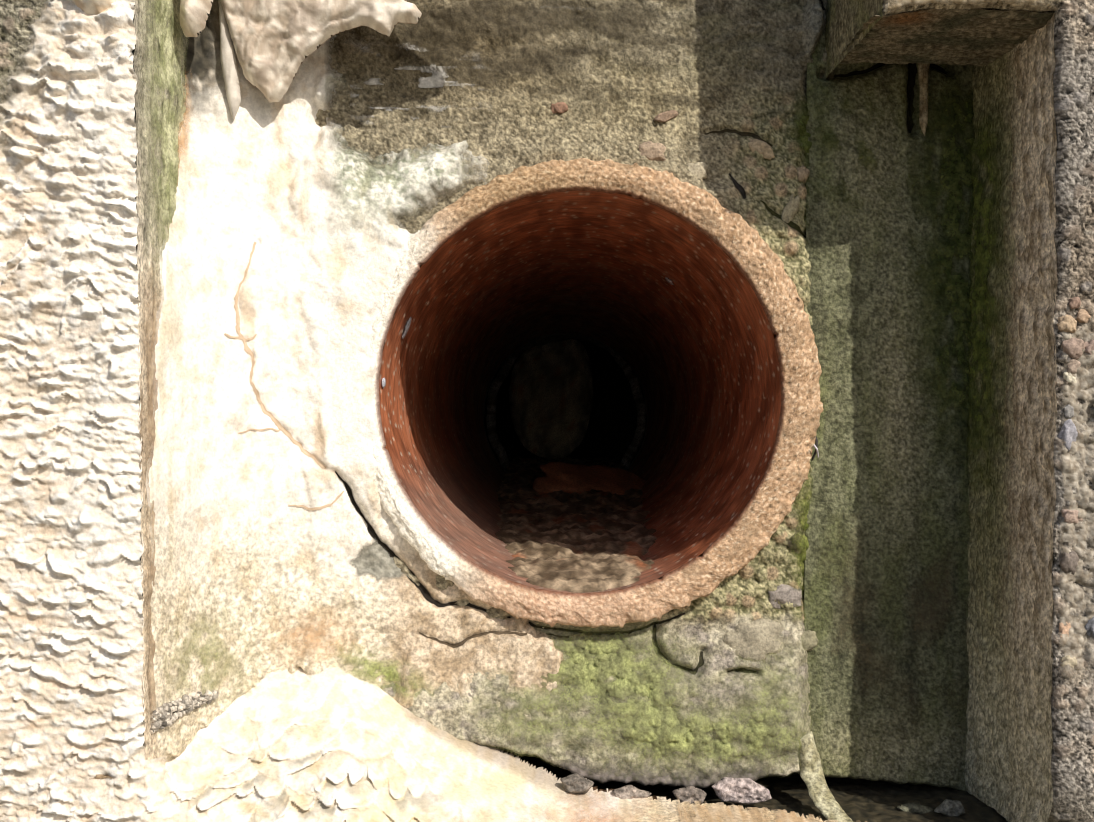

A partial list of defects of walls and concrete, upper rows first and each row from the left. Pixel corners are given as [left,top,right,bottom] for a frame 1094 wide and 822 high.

crack [224,242,756,675]